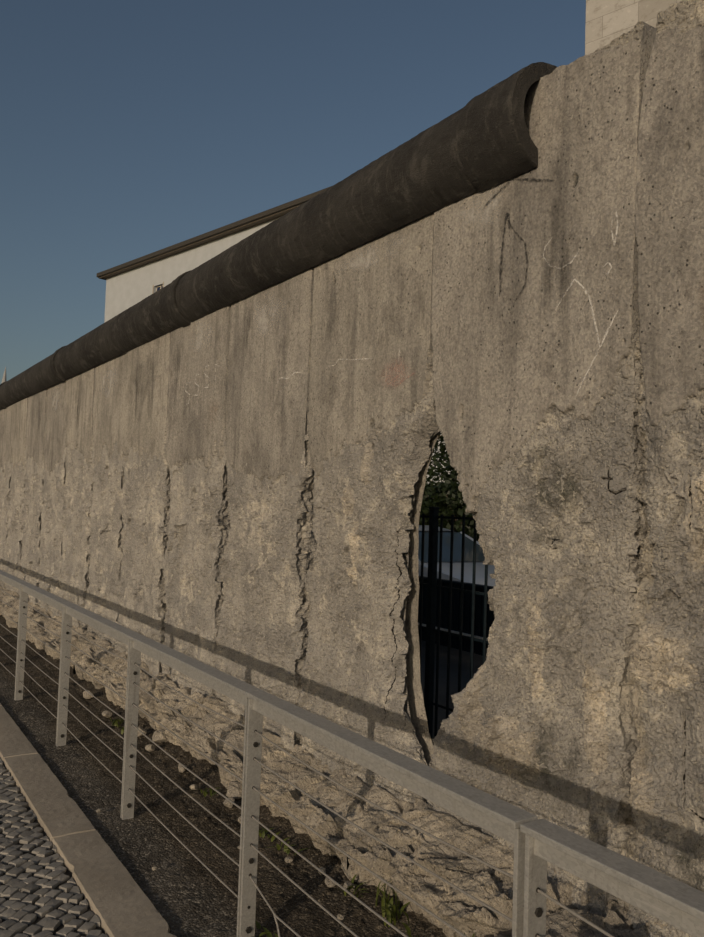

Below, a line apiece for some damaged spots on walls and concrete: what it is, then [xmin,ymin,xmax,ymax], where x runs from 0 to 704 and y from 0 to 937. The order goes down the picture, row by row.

crack [602,470,625,495]
spalling [0,336,704,892]
crack [384,531,402,721]
spalling [547,862,607,918]
spalling [617,898,693,937]